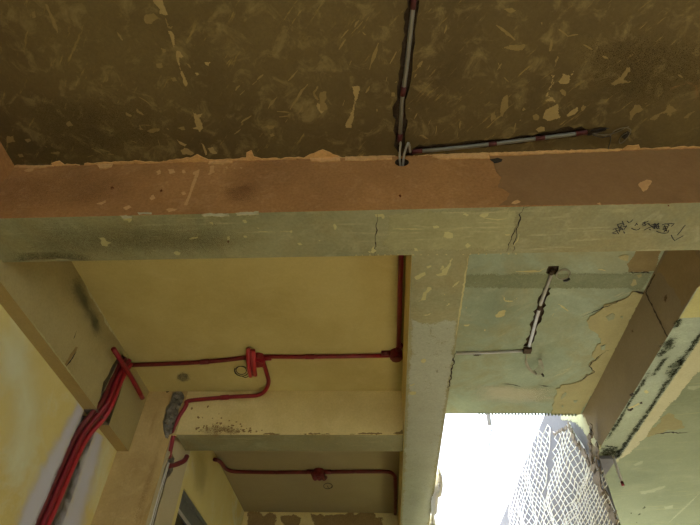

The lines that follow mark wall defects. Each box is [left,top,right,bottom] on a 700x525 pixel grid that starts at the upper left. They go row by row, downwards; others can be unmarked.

peeling [144,0,199,87]
peeling [179,113,203,134]
peeling [345,86,360,128]
peeling [533,71,586,132]
crack [508,206,530,251]
peeling [478,250,700,416]
damp [601,333,700,457]